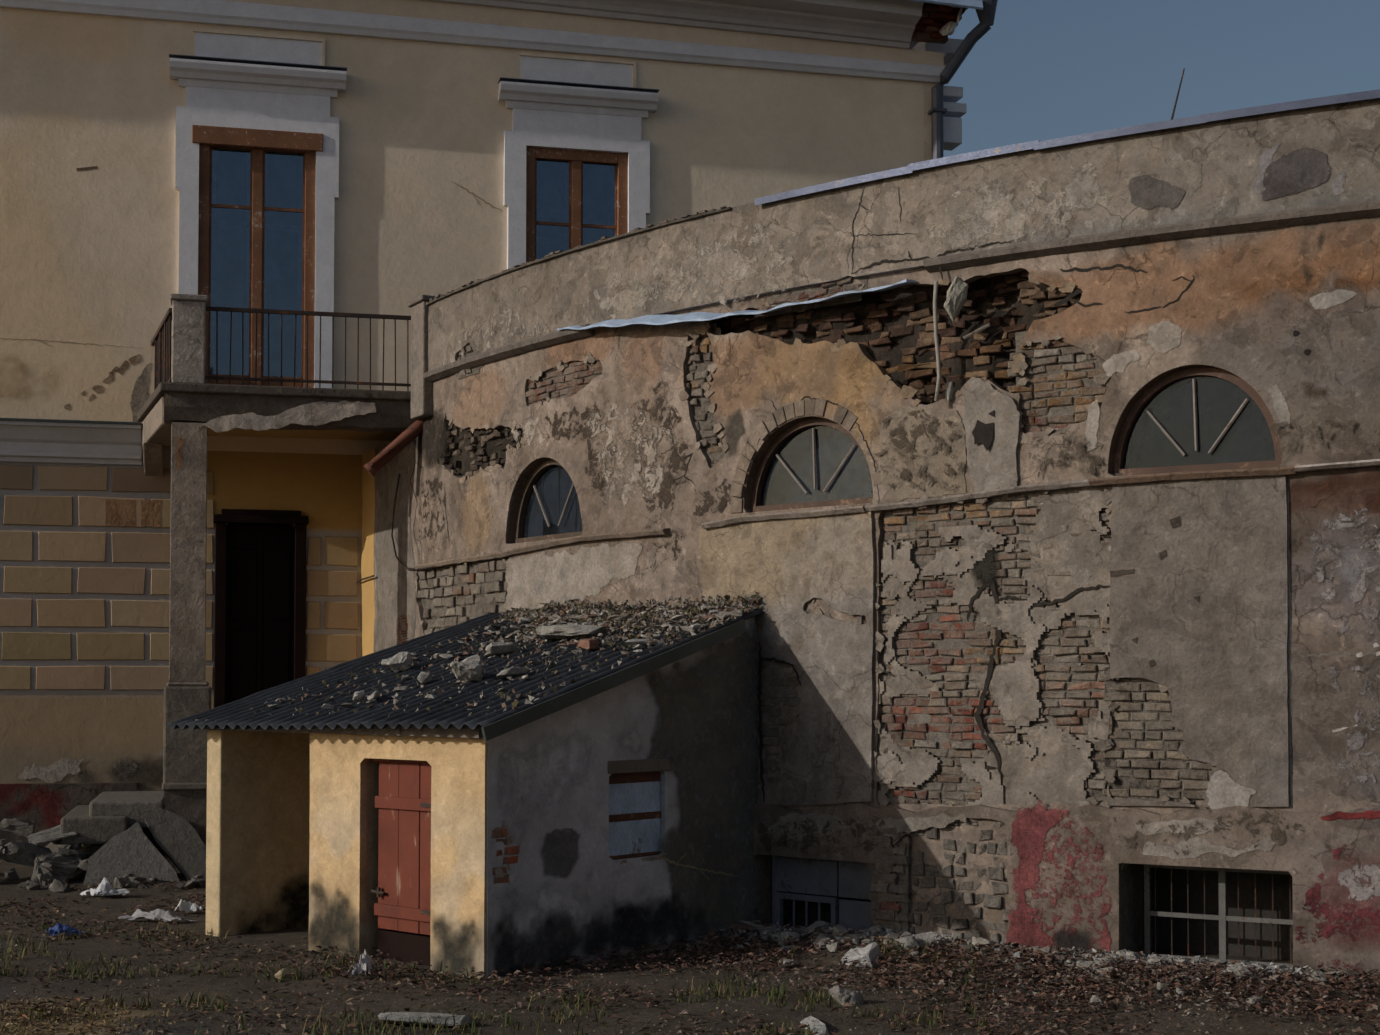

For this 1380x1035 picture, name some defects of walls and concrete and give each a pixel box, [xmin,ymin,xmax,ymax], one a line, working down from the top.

flaking render [911,2,965,44]
crack [851,187,1013,280]
crack [1054,264,1195,313]
flaking render [414,264,1304,952]
crack [967,580,1110,777]
damp [496,629,758,977]
damp [243,882,360,959]
peeling [1295,845,1380,944]